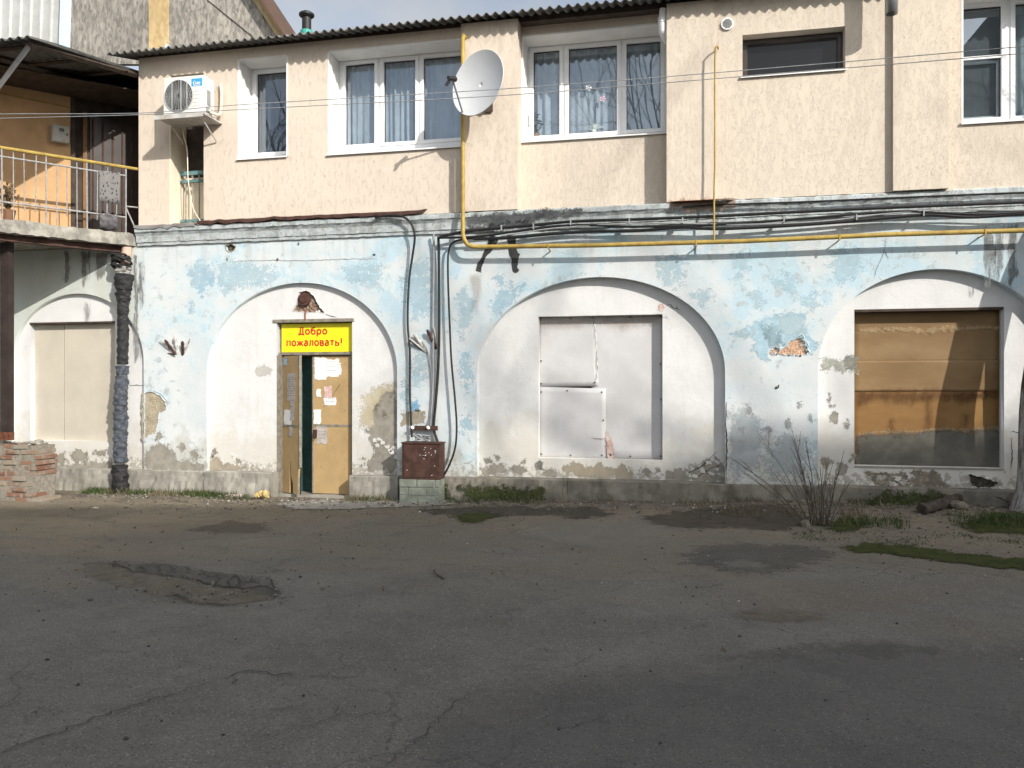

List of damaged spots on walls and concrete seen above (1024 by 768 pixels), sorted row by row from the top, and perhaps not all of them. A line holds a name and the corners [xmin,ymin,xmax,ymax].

water stain [983,225,1018,286]
peeling [488,272,531,320]
peeling [729,310,860,375]
peeling [141,390,263,471]
flaking render [359,383,426,474]
peeling [55,448,112,468]
peeling [480,454,527,476]
flaking render [540,431,725,482]
spalling [967,472,1002,489]